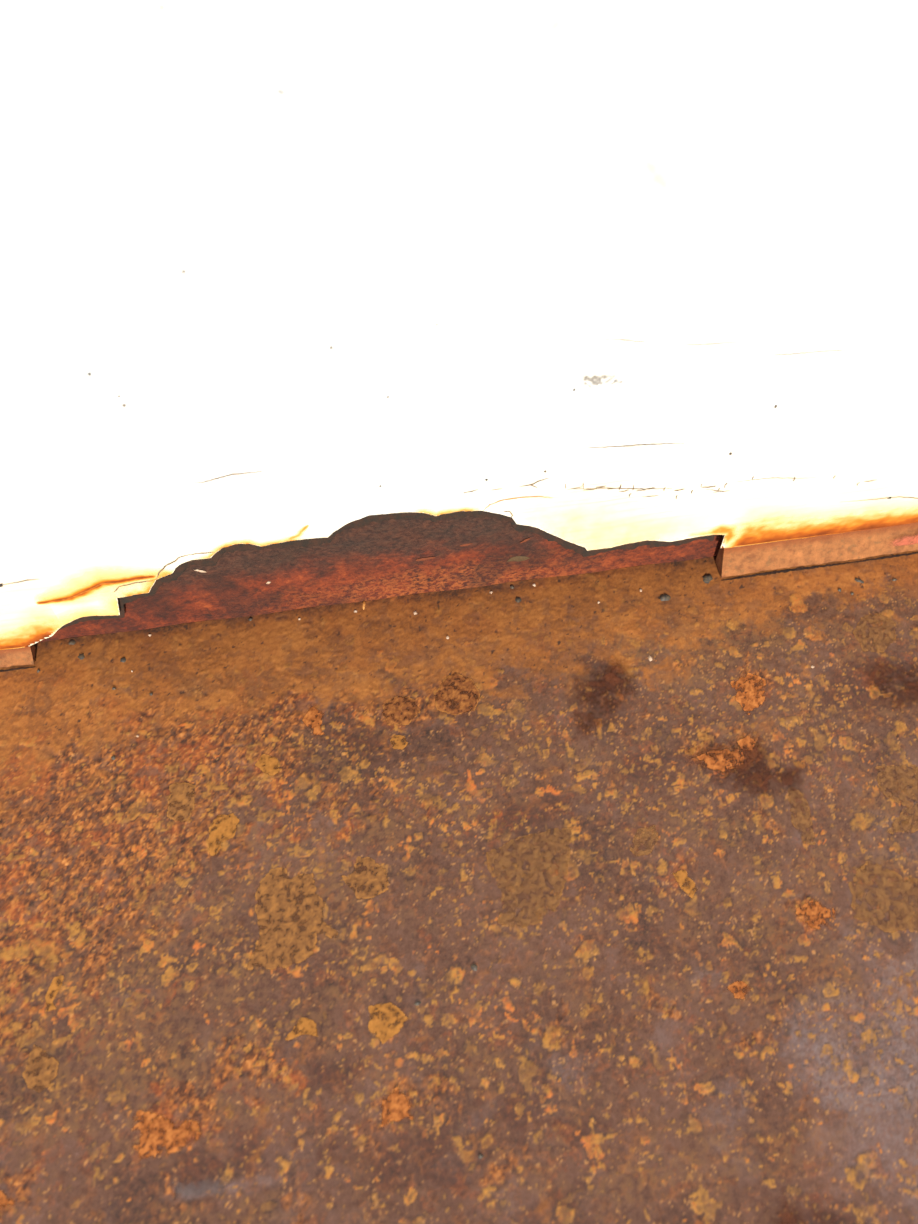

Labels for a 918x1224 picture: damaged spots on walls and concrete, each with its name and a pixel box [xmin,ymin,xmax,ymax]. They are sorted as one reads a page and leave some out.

rust [203,525,308,558]
spalling [40,511,725,642]
rust [0,571,173,650]
rust [730,673,766,715]
rust [302,706,325,735]
rust [697,735,815,845]
rust [208,813,240,856]
rust [246,867,338,970]
rust [285,1017,318,1041]
rust [368,1002,408,1044]
rust [380,1087,413,1127]
rust [131,1110,202,1159]